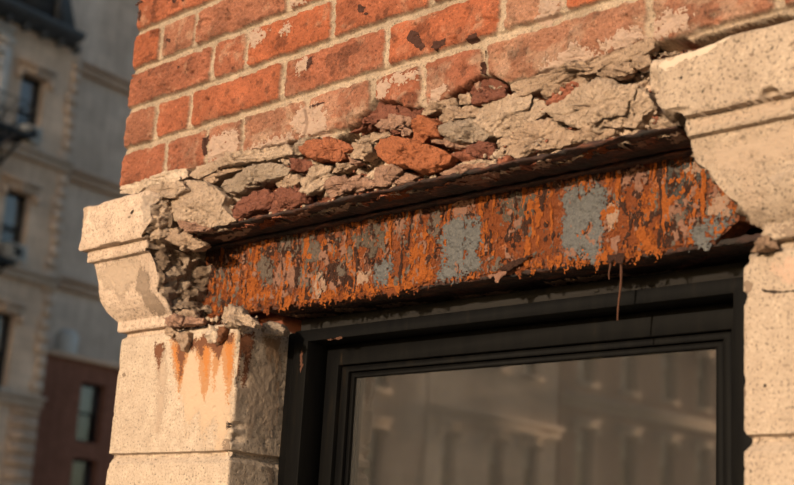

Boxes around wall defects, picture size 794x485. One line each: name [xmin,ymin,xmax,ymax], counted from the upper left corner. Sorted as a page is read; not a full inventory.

spalling [467,78,512,108]
spalling [289,102,459,176]
spalling [465,140,499,161]
spalling [128,192,157,223]
spalling [232,185,316,220]
corrosion [202,155,737,321]
crack [761,287,794,295]
corrosion [154,332,283,456]